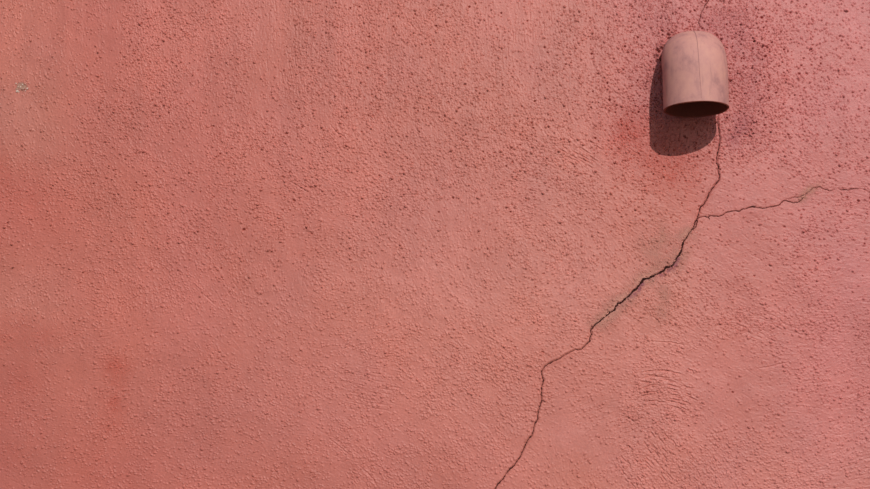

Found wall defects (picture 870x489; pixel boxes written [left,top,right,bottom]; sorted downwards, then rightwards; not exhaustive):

crack [495,118,854,489]